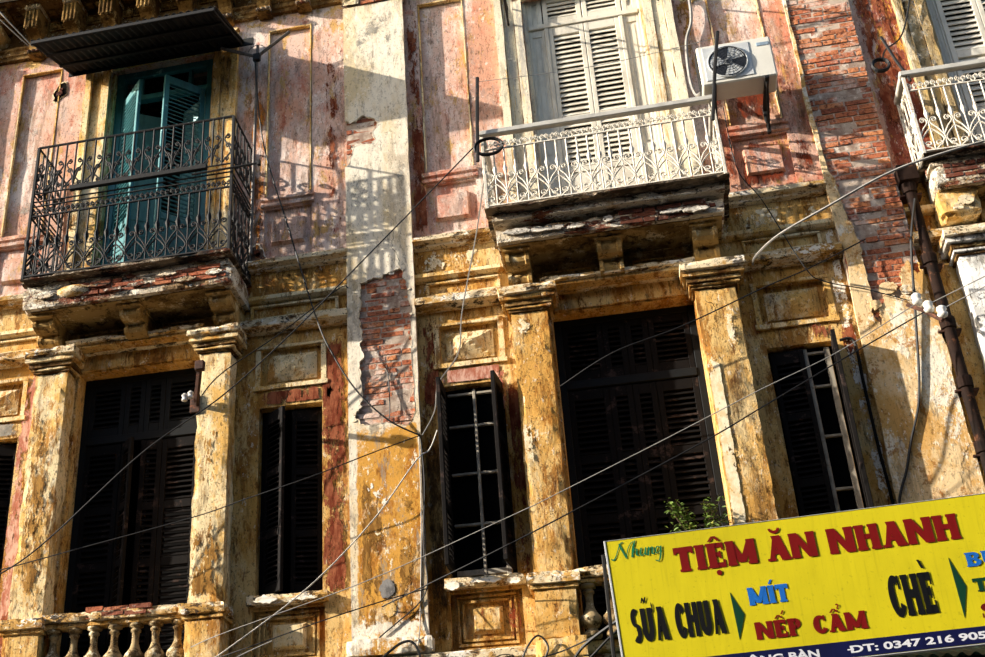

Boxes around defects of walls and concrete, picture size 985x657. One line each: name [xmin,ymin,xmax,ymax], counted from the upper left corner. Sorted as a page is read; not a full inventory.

peeling [326,63,379,200]
spalling [786,0,921,318]
spalling [943,158,985,178]
spalling [603,199,716,225]
peeling [739,208,779,227]
flaking render [953,194,974,210]
flaking render [502,222,586,235]
spalling [70,263,226,298]
flaking render [34,291,54,300]
spalling [263,265,534,597]
flaking render [253,595,277,604]
spalling [86,602,154,619]